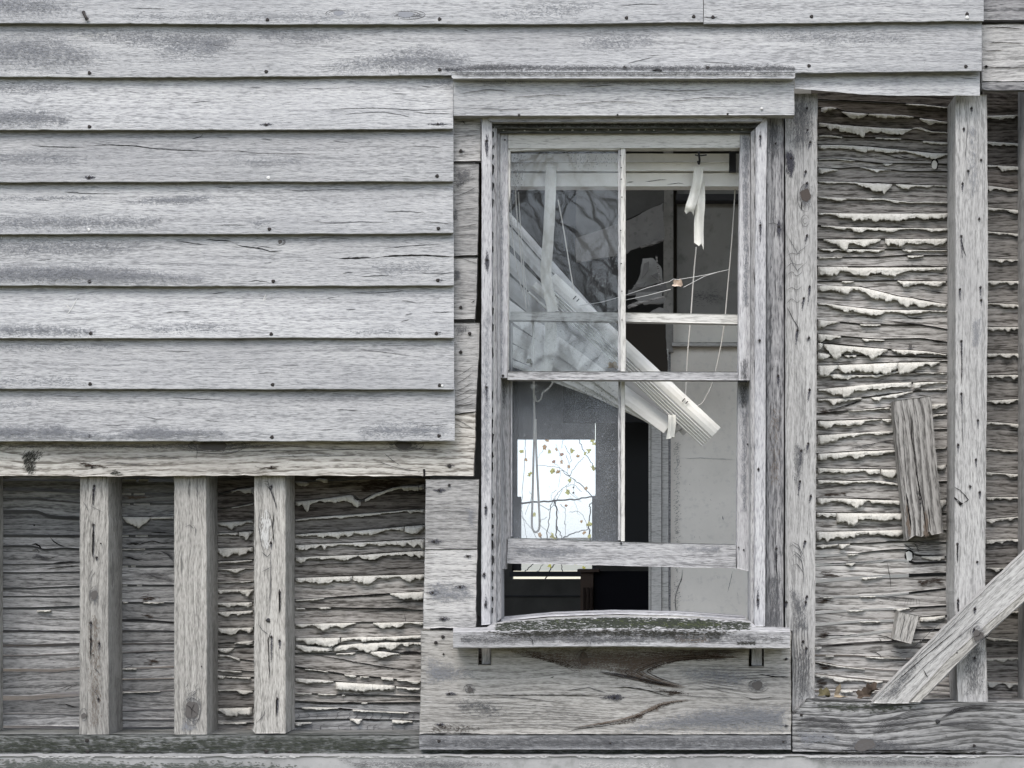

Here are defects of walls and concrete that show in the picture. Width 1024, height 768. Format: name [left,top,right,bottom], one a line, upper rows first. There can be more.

crack [34,134,303,154]
crack [181,182,478,322]
flaking render [818,104,948,486]
flaking render [296,485,425,563]
flaking render [816,498,903,566]
flaking render [218,707,252,725]
flaking render [217,521,254,695]
flaking render [295,669,420,724]
flaking render [296,622,423,658]
flaking render [296,574,424,600]
leakage [341,570,987,768]
flaking render [815,647,906,693]